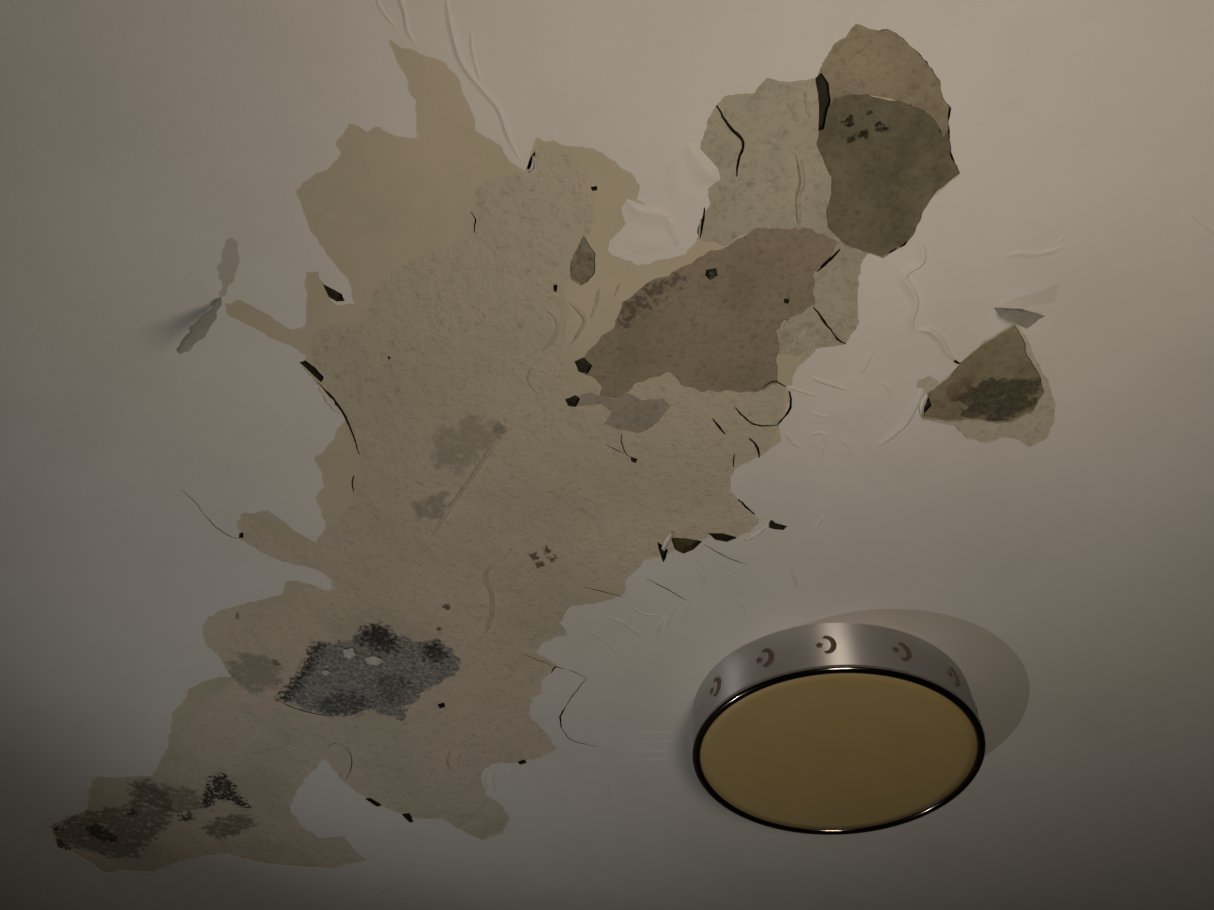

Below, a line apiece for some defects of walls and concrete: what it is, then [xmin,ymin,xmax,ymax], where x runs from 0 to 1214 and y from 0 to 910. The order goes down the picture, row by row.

leakage [841,111,889,143]
flaking render [917,308,1055,447]
peeling [52,24,959,872]
leakage [227,623,461,721]
leakage [50,773,255,859]